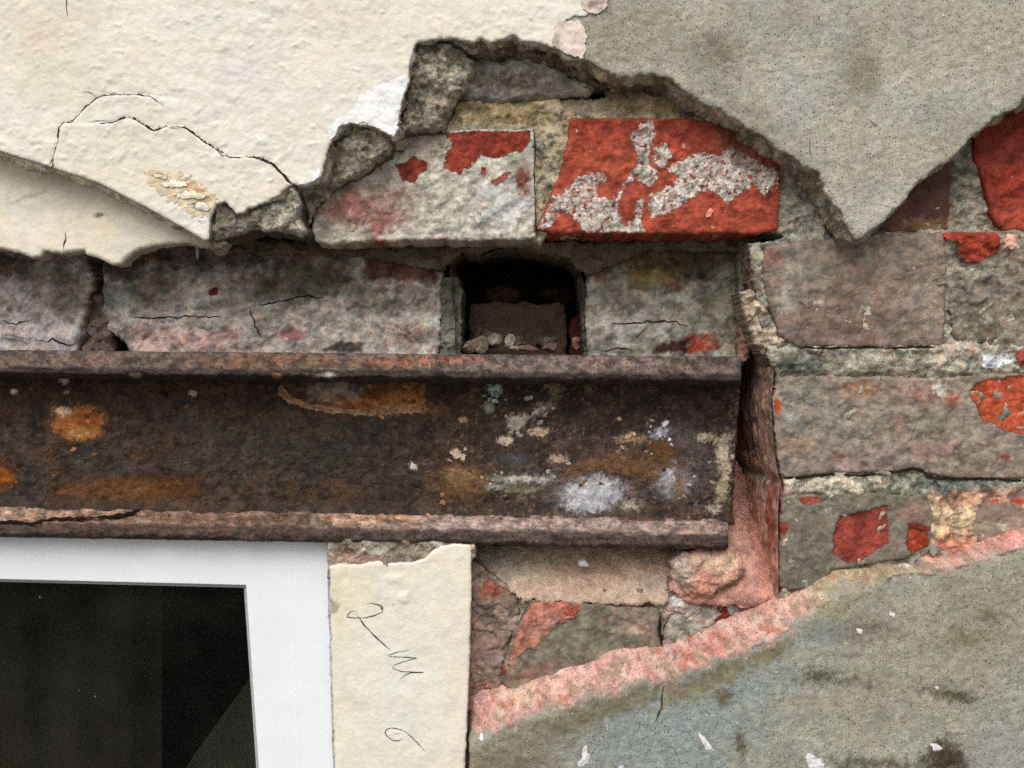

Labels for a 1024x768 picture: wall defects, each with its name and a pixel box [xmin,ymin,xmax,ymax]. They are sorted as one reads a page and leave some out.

crack [44,91,295,187]
spalling [144,0,666,245]
peeling [538,120,779,233]
spalling [943,232,1001,262]
spalling [970,348,1024,434]
corrosion [46,402,108,456]
corrosion [0,456,21,488]
corrosion [47,471,207,506]
corrosion [432,451,494,512]
corrosion [562,436,690,515]
spalling [833,506,889,563]
spalling [502,601,579,676]